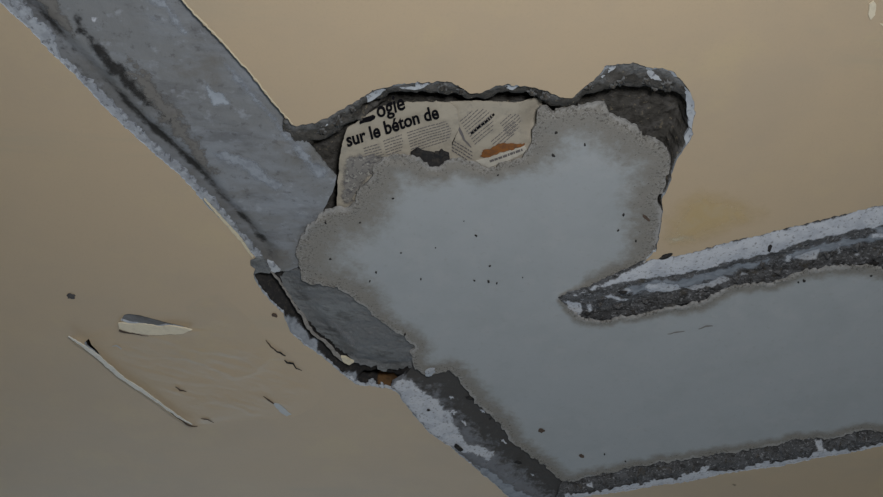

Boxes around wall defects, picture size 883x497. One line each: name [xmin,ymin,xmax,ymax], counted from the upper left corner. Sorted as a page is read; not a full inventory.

spalling [0,0,695,365]
spalling [558,205,883,321]
peeling [357,366,883,497]